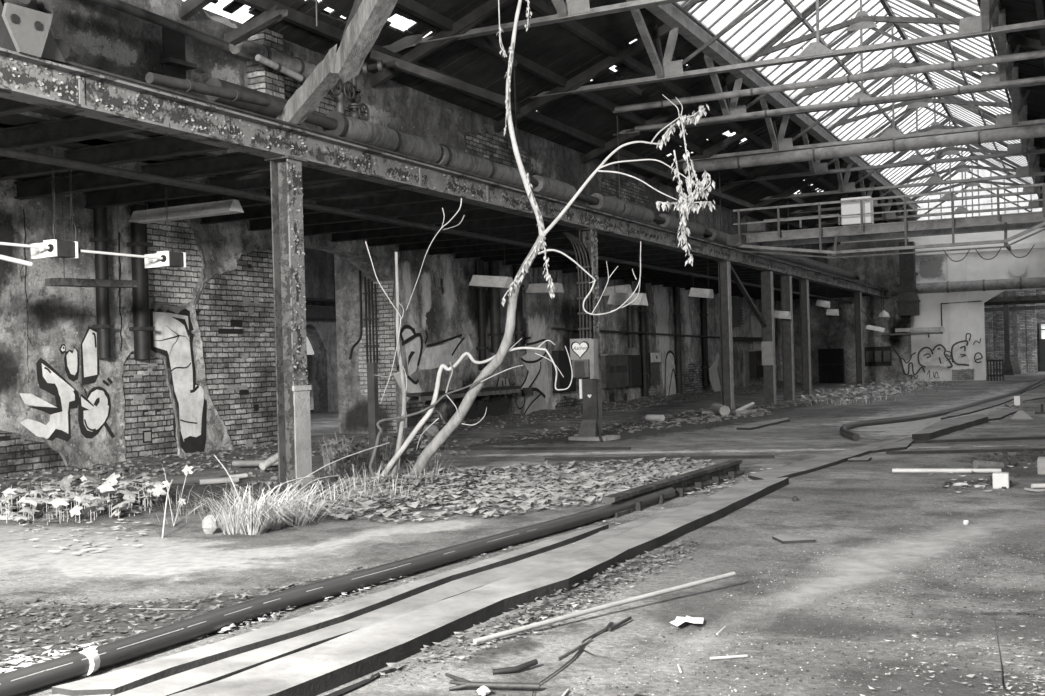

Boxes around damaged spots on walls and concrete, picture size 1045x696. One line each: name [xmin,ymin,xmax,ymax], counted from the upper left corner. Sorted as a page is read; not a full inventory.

peeling [75,30,137,66]
peeling [0,58,81,101]
peeling [211,58,248,88]
flaking render [284,74,303,100]
flaking render [458,125,542,173]
peeling [323,145,734,338]
peeling [41,262,80,301]
flaking render [95,81,391,465]
flaking render [358,280,446,434]
flaking render [682,357,711,393]
flaking render [0,343,184,479]